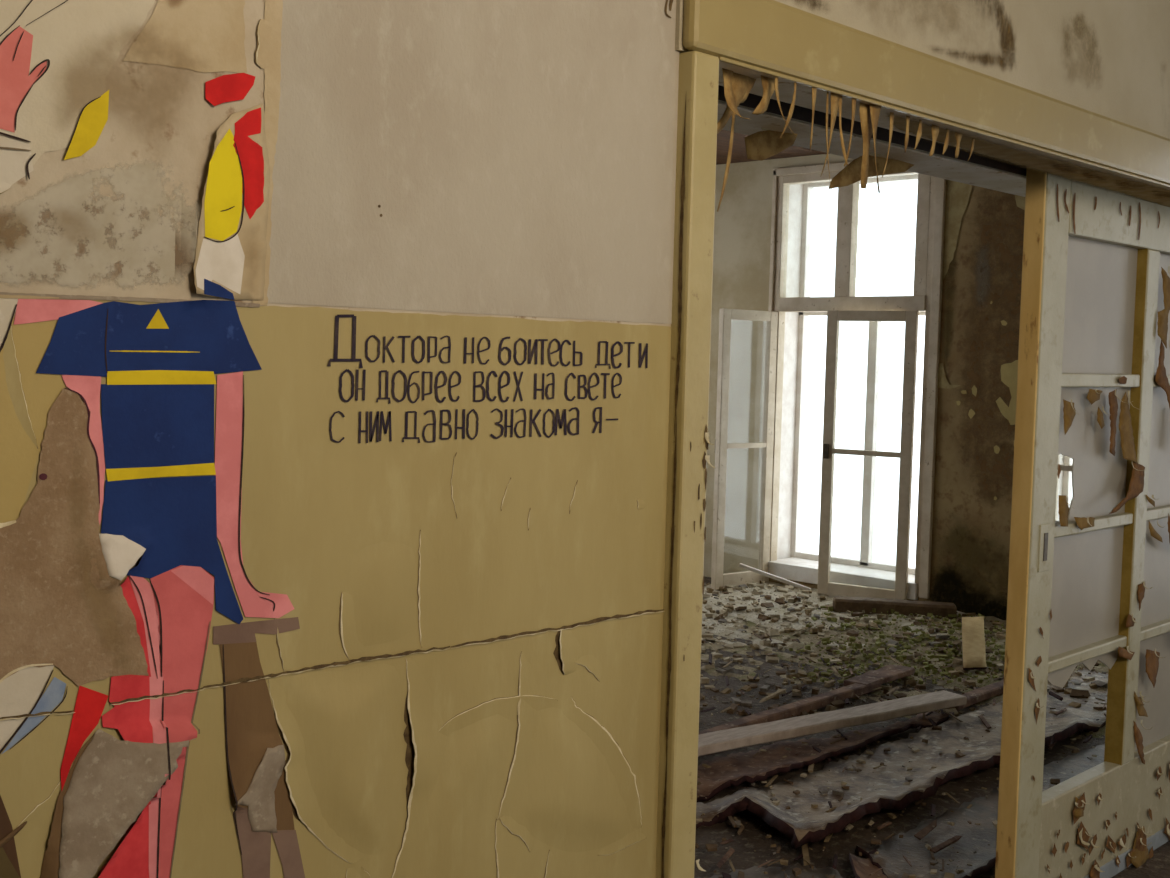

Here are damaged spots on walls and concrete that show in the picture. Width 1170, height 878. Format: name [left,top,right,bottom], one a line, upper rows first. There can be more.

damp [953,6,1014,68]
peeling [0,0,283,307]
peeling [717,68,975,212]
peeling [1155,266,1170,408]
peeling [0,388,149,686]
crack [111,100,686,878]
damp [931,528,1008,620]
peeling [1058,376,1170,543]
crack [0,710,75,721]
peeling [1118,646,1167,764]
peeling [58,729,195,878]
peeling [1047,763,1170,878]